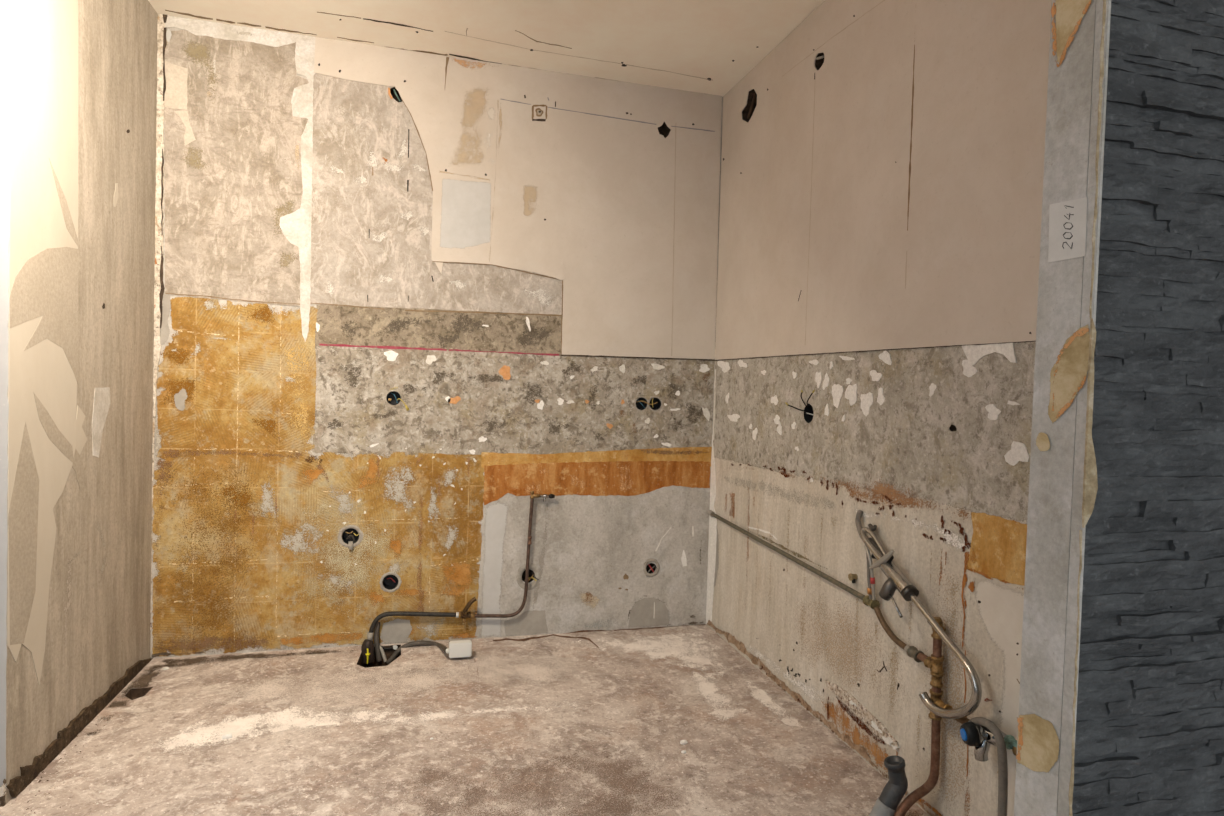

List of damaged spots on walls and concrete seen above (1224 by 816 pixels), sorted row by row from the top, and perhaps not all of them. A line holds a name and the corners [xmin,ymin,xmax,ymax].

spalling [388,87,402,102]
peeling [384,350,399,361]
peeling [498,365,511,380]
peeling [174,388,188,411]
spalling [386,387,409,411]
peeling [535,398,600,410]
peeling [261,473,277,518]
peeling [279,436,487,617]
rust [725,491,838,630]
rust [930,548,975,718]
spalling [357,645,401,668]
flaking render [707,620,900,779]